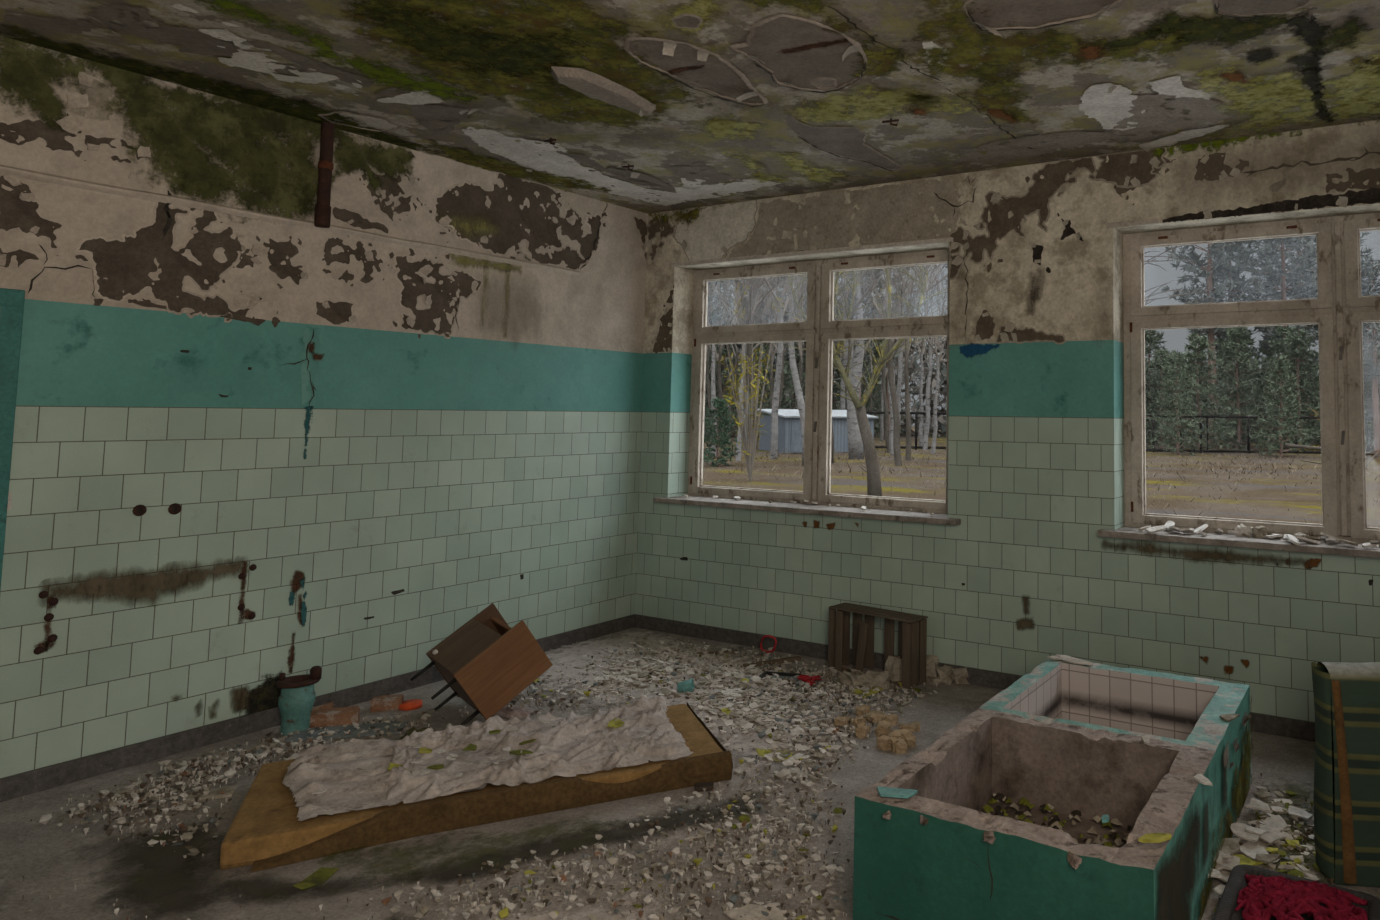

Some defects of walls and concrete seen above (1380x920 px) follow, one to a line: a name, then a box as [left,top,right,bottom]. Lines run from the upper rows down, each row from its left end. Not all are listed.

peeling [551,66,656,117]
water stain [1246,15,1334,123]
peeling [634,147,1176,280]
peeling [1194,153,1249,181]
peeling [1325,168,1380,208]
peeling [0,170,607,339]
peeling [653,285,674,355]
peeling [975,310,1066,344]
rust [239,561,255,623]
rust [36,596,56,652]